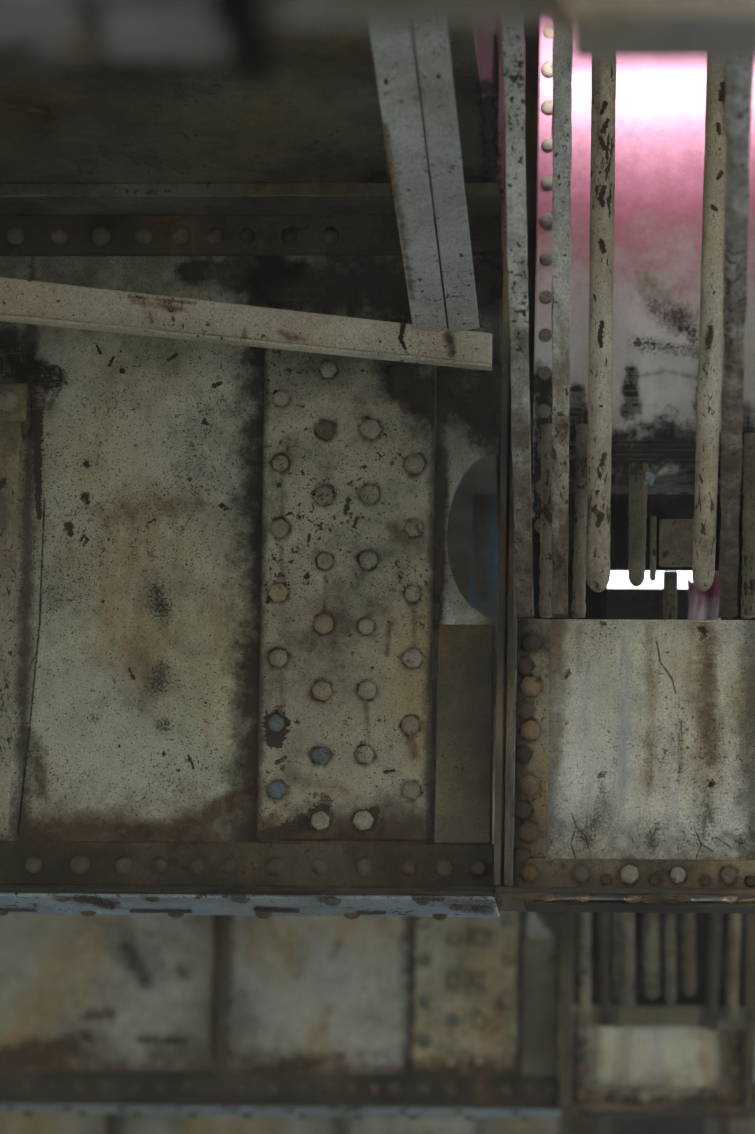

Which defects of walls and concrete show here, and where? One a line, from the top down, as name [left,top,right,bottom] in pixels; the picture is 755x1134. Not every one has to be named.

crack [655,637,676,694]
rust [697,622,719,764]
crack [571,812,609,858]
crack [695,830,731,858]
peeling [0,888,494,914]
rust [0,1009,116,1069]